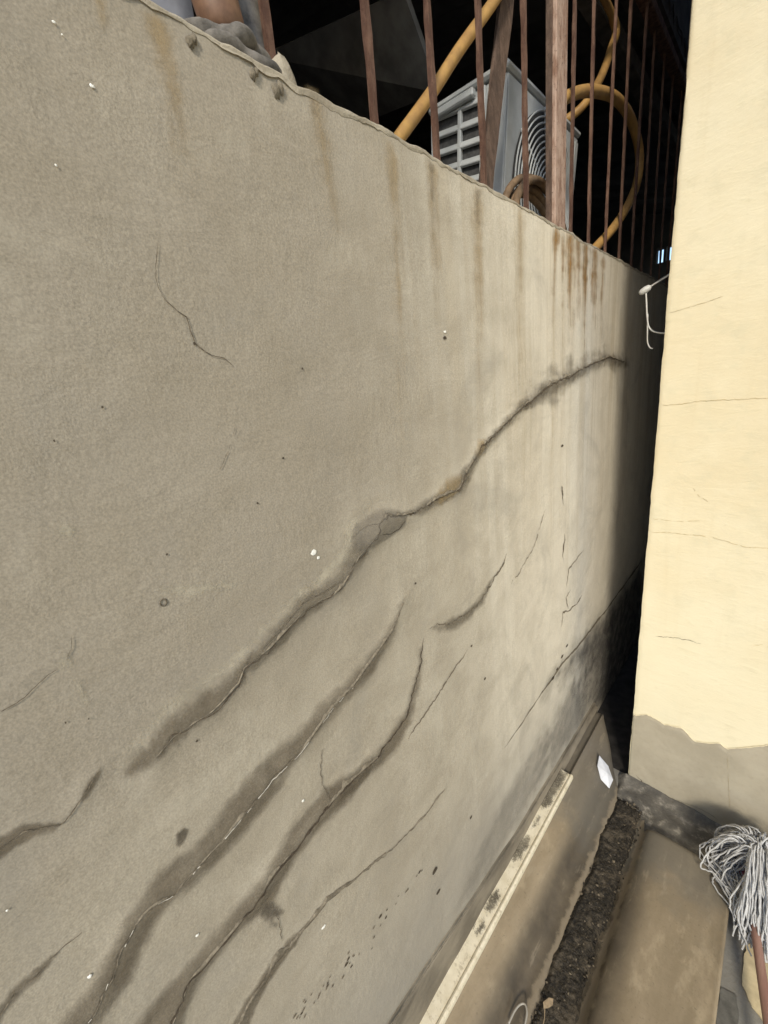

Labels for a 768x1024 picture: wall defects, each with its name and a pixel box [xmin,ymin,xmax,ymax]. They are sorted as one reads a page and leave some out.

crack [156,247,234,367]
rust [554,230,603,298]
damp [129,523,366,773]
crack [156,355,625,759]
damp [447,583,491,628]
damp [570,570,641,703]
damp [0,825,53,856]
crack [0,777,95,849]
damp [69,681,417,1024]
crack [88,487,640,1024]
damp [473,889,501,935]
damp [542,770,568,808]